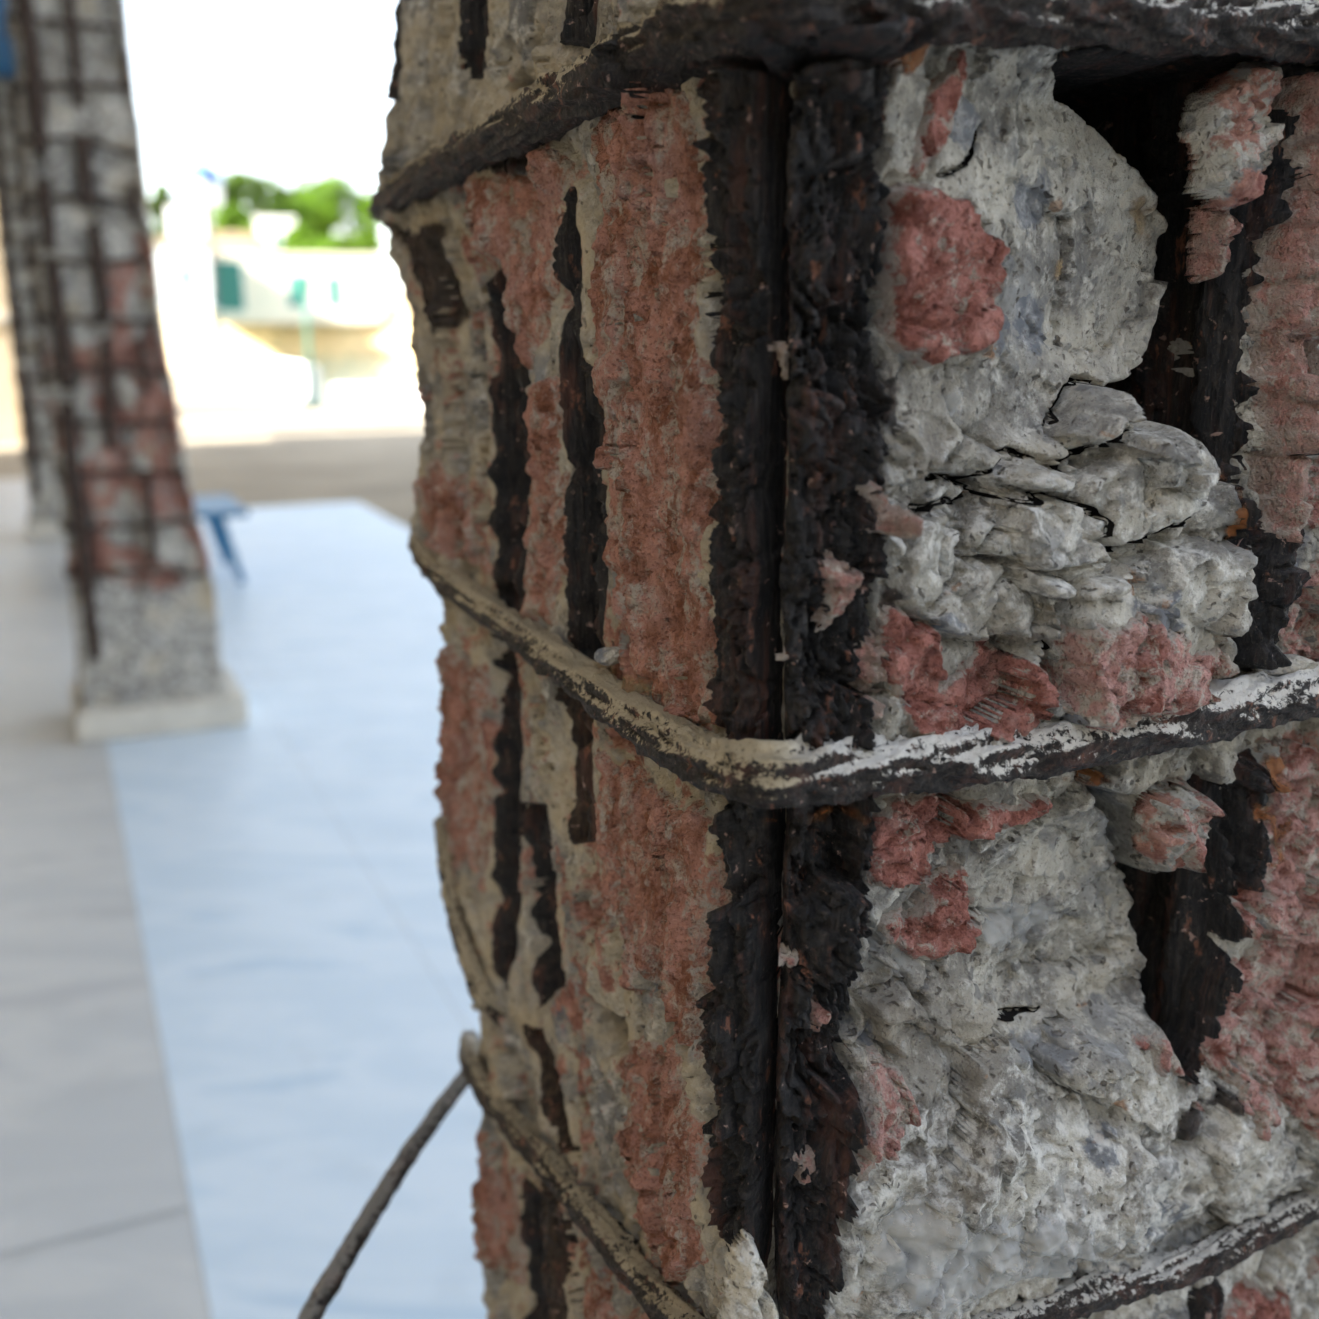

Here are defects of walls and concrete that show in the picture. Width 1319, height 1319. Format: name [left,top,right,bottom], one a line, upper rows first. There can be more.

spalling [16,0,49,156]
spalling [0,133,102,660]
spalling [87,223,112,320]
corrosion [586,13,948,104]
spalling [412,45,1319,751]
crack [908,377,1191,552]
corrosion [1051,47,1307,175]
corrosion [1155,194,1205,434]
corrosion [1214,370,1265,550]
corrosion [1239,109,1300,326]
spalling [433,633,1319,1319]
corrosion [1134,779,1253,1141]